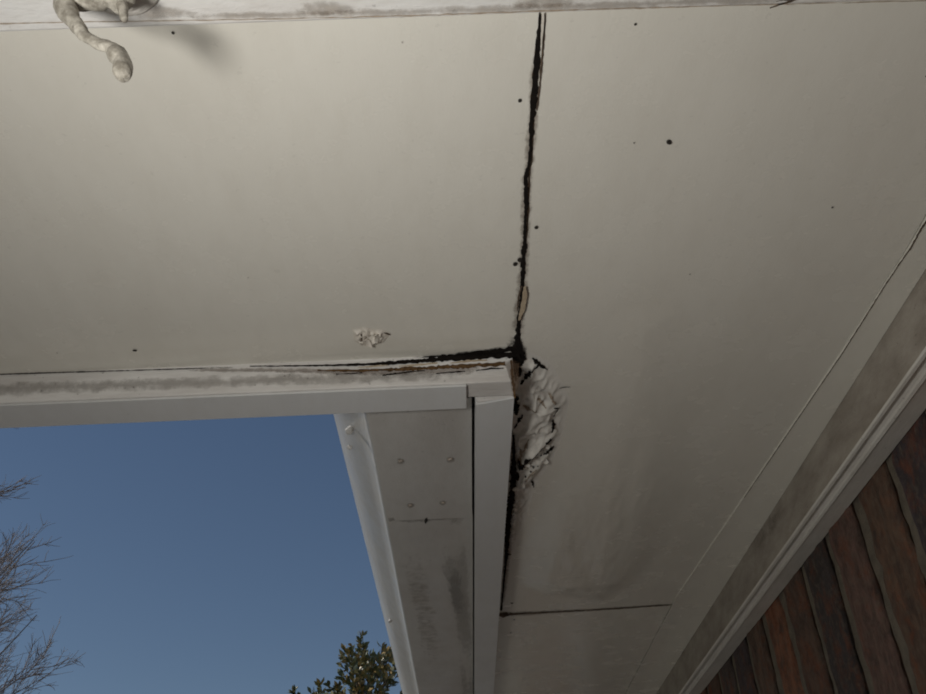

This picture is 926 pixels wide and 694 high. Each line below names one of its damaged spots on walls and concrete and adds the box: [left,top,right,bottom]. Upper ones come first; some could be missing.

crack [0,0,926,341]
peeling [501,353,570,593]
crack [744,221,926,498]